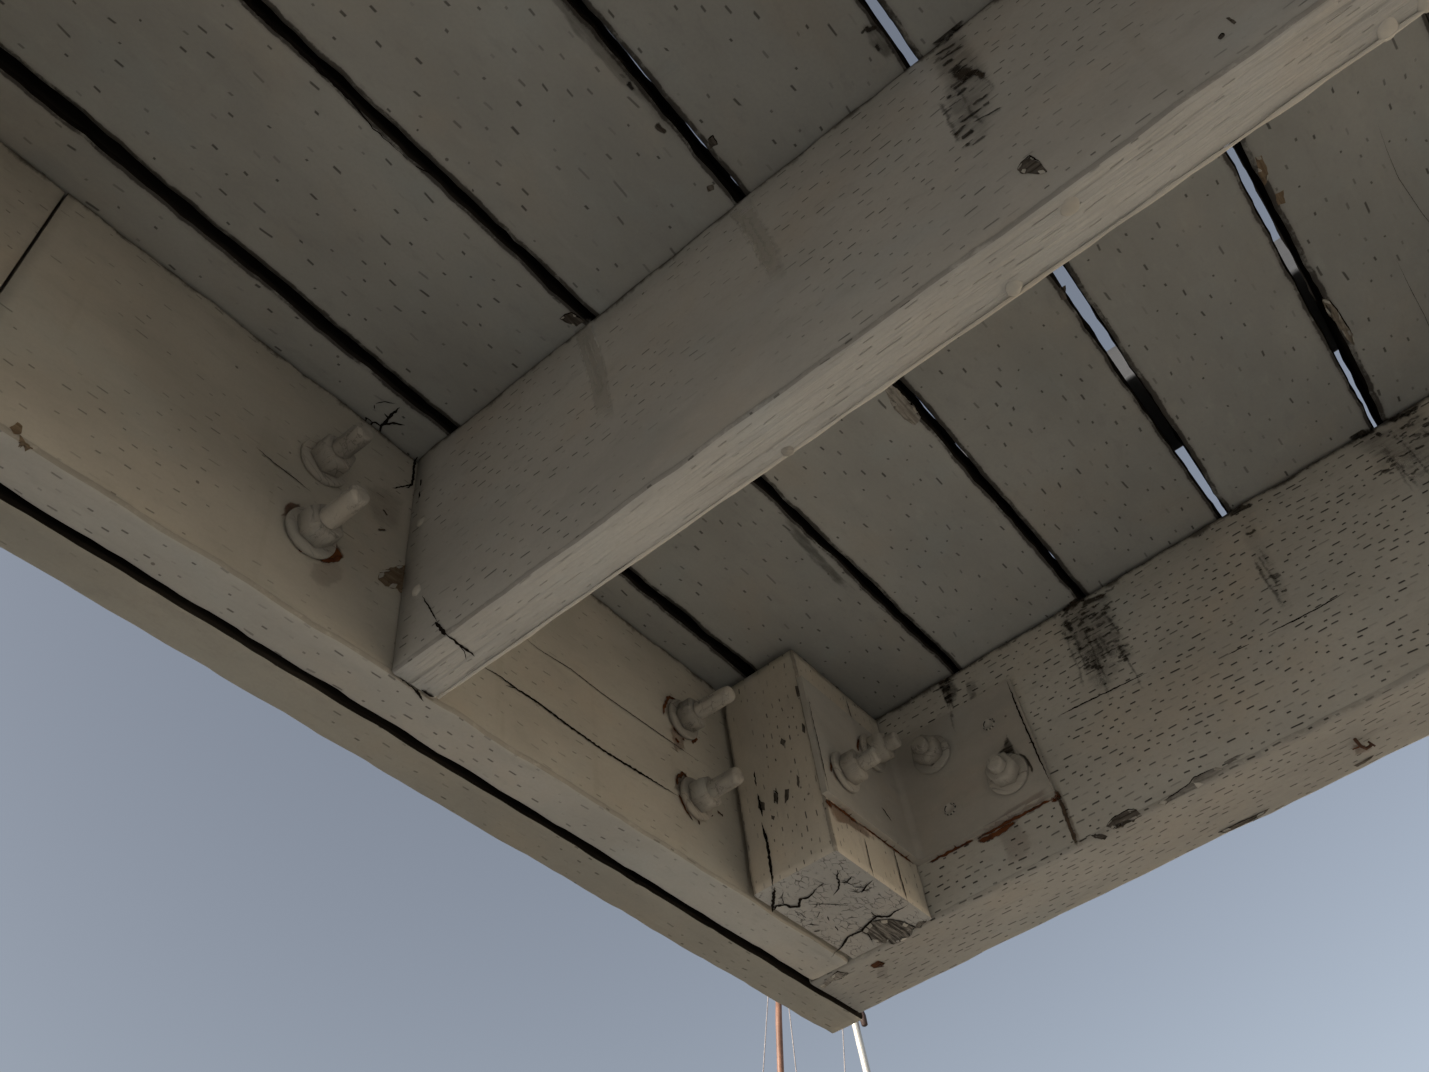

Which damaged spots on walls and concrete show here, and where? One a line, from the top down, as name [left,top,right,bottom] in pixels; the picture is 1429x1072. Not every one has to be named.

leakage [933,21,1000,146]
crack [365,401,403,432]
leakage [1350,406,1429,444]
crack [395,457,421,497]
corrosion [321,544,343,563]
leakage [1061,594,1128,670]
crack [422,596,697,797]
crack [754,772,909,955]
corrosion [826,799,911,862]
corrosion [929,791,1077,863]